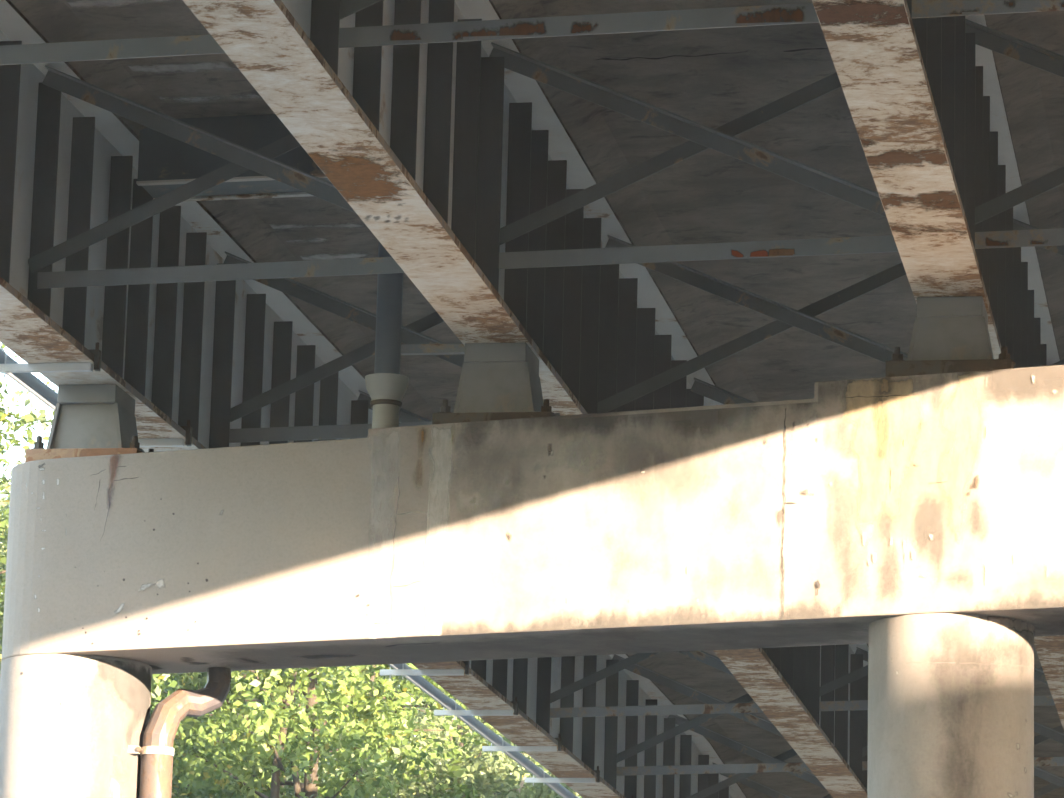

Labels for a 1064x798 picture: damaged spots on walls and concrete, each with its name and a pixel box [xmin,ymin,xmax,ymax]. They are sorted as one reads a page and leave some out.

rust [736,0,909,27]
rust [453,22,546,40]
rust [860,137,948,170]
rust [309,149,411,203]
rust [880,190,960,210]
water stain [502,406,759,434]
crack [781,408,795,583]
water stain [425,428,489,636]
water stain [890,499,942,562]
water stain [981,597,1064,611]
water stain [505,605,835,633]
spalling [988,616,1035,634]